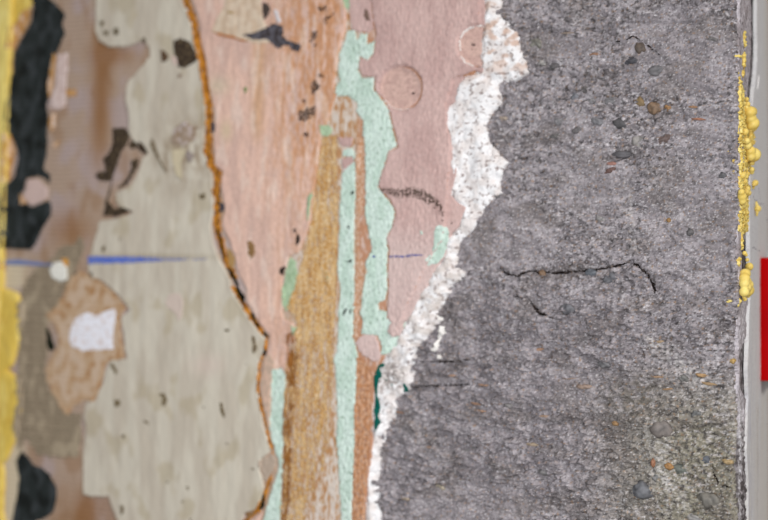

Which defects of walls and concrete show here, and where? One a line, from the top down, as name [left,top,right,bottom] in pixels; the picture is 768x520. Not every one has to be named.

peeling [51,53,68,128]
peeling [23,179,49,205]
peeling [49,258,78,282]
peeling [82,0,271,520]
spalling [192,0,753,520]
crack [500,262,656,319]
peeling [69,309,116,351]